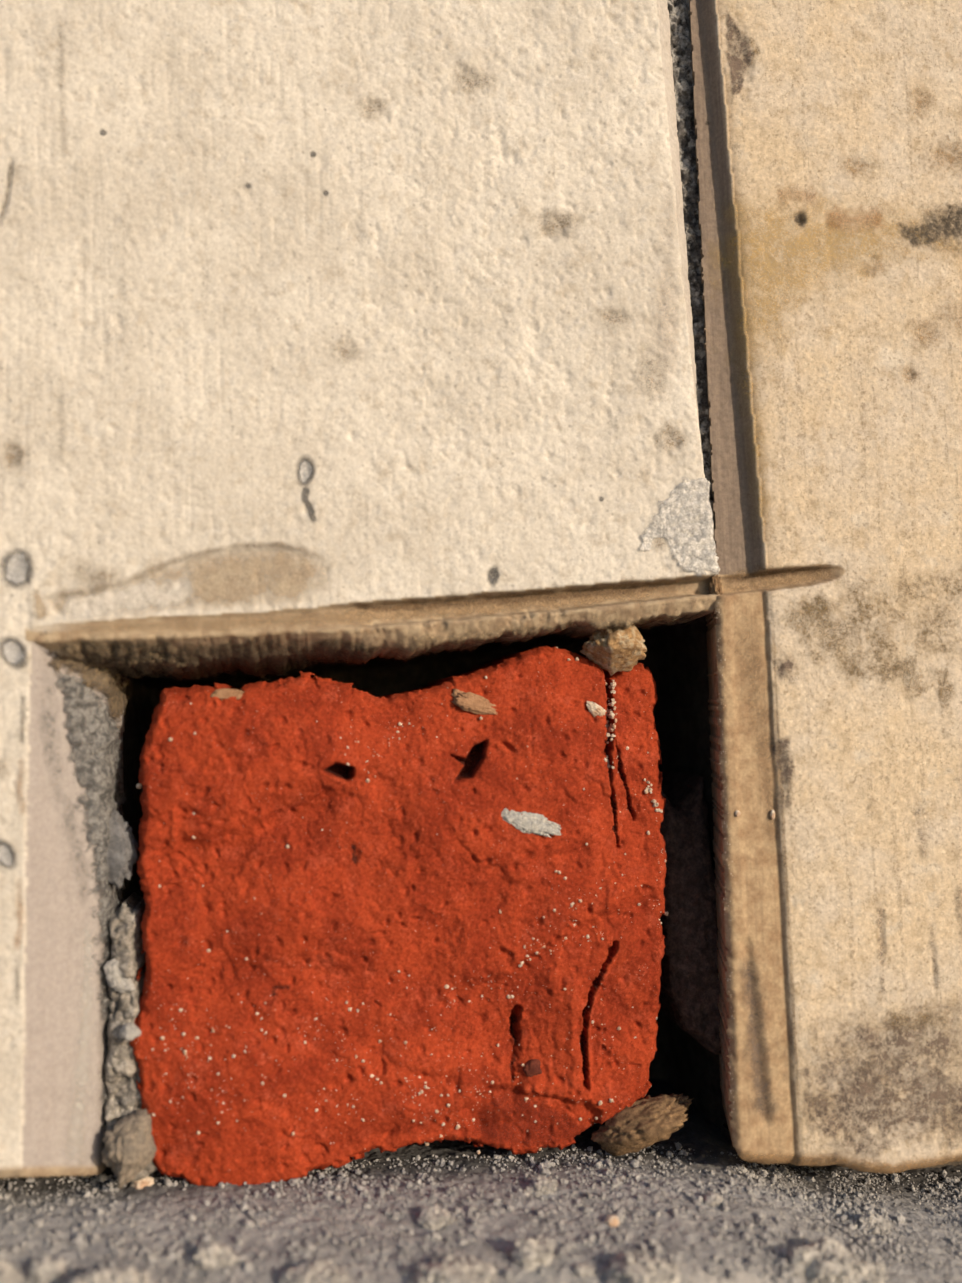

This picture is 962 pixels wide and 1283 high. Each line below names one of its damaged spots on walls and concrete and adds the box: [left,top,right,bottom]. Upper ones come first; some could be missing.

leakage [722,205,962,332]
leakage [787,586,920,695]
peeling [210,688,244,701]
peeling [586,701,607,717]
spalling [325,764,353,779]
spalling [456,742,484,780]
crack [604,681,632,843]
peeling [501,808,562,838]
crack [580,953,612,1084]
peeling [523,1059,542,1077]
spalling [478,1095,577,1145]
leakage [739,1154,962,1174]